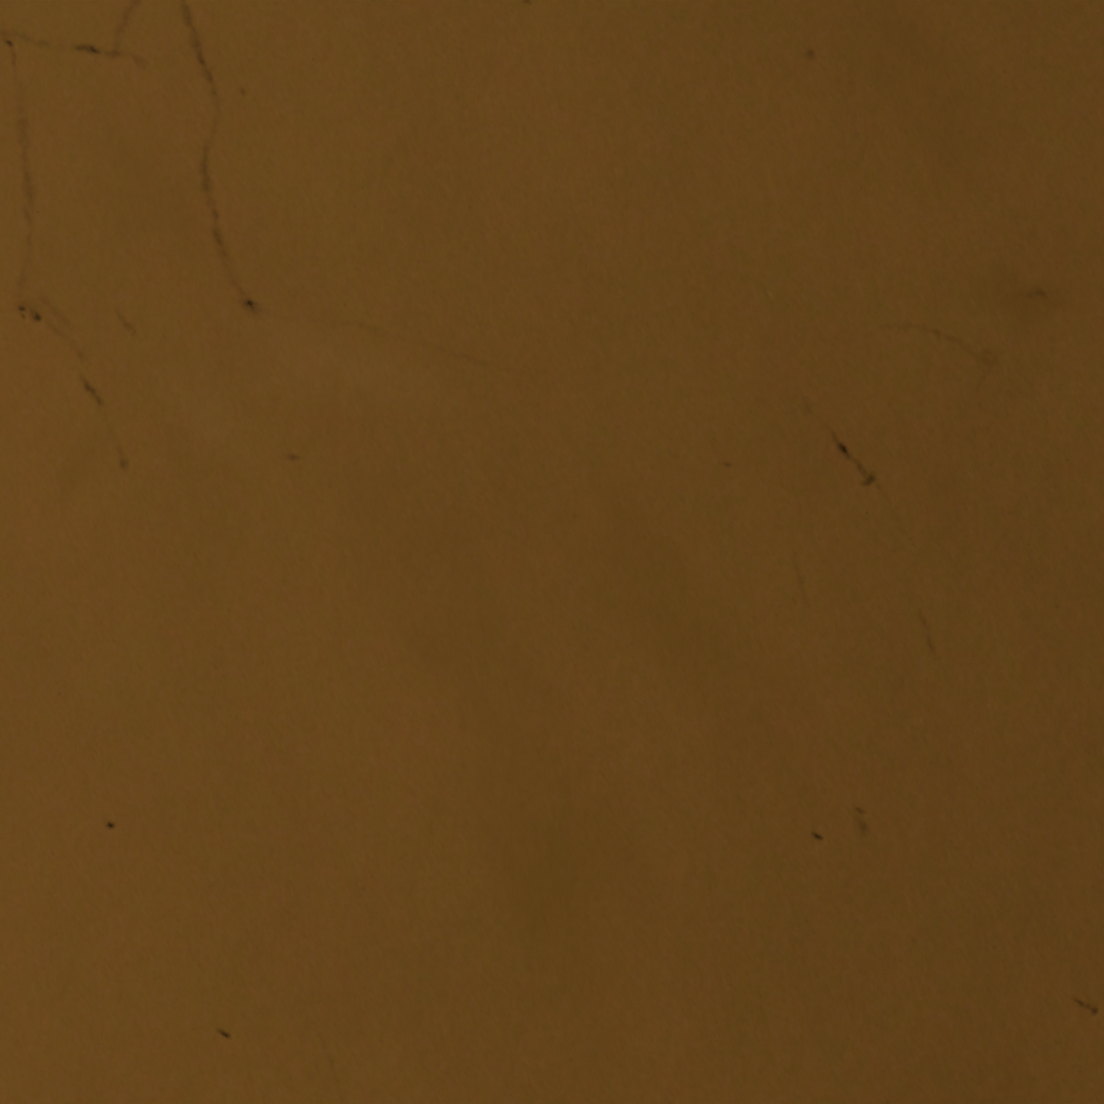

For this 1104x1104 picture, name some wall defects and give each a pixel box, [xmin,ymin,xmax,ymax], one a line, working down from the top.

crack [0,27,149,85]
crack [794,382,914,541]